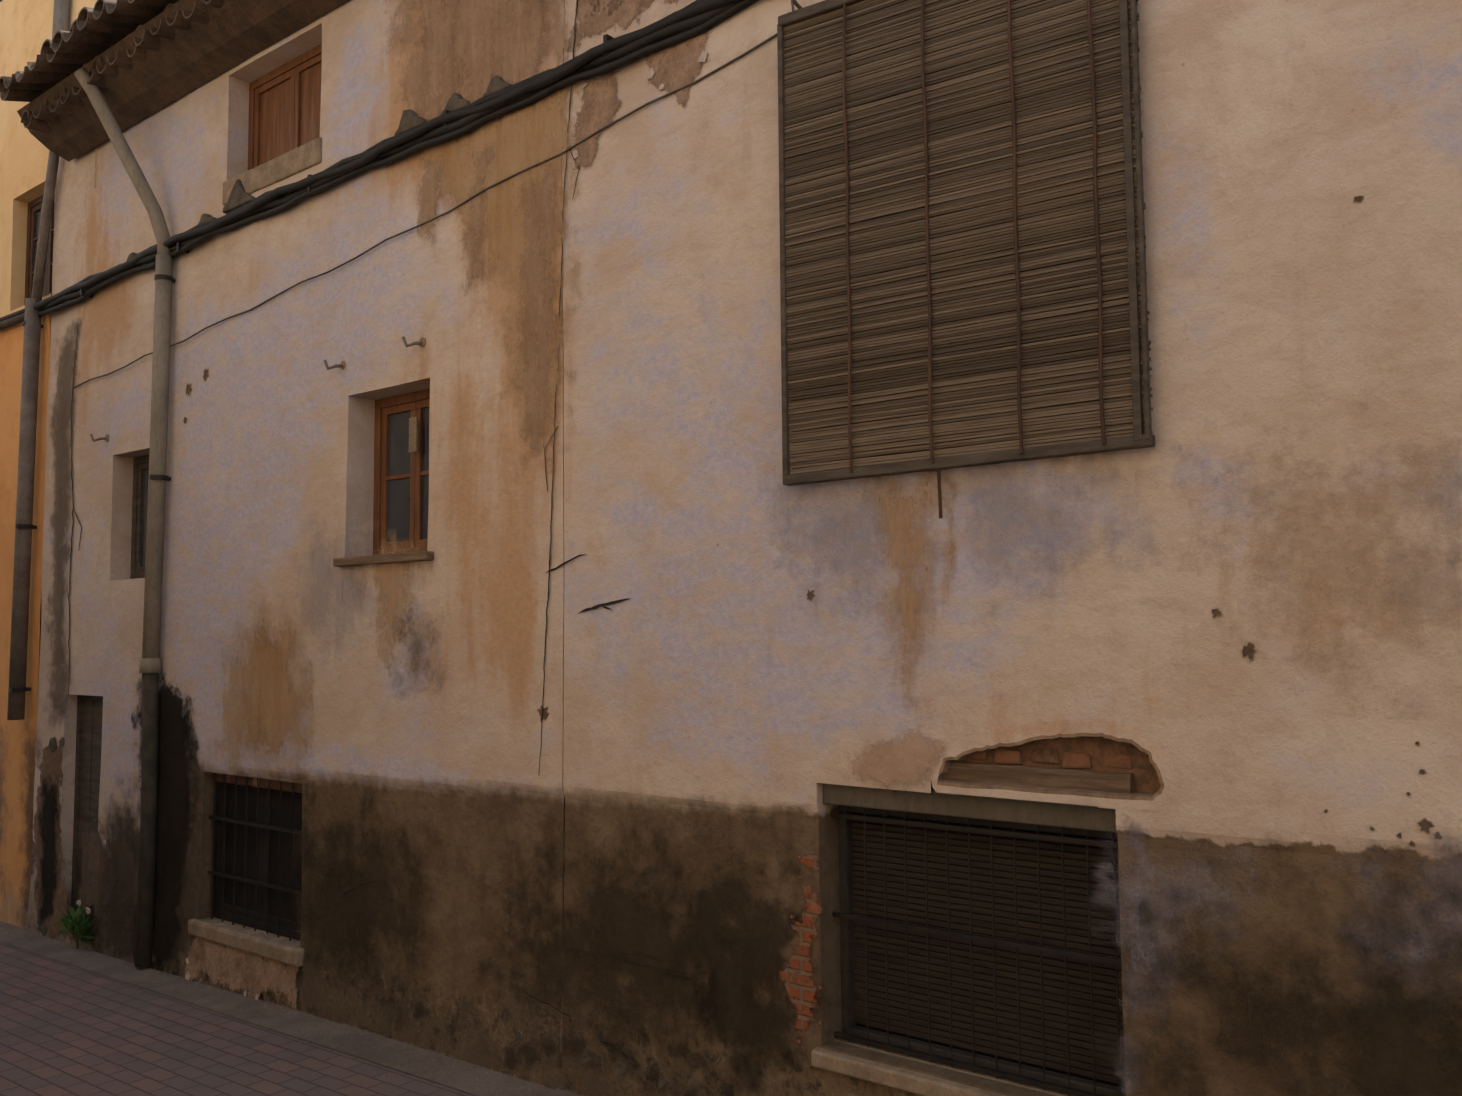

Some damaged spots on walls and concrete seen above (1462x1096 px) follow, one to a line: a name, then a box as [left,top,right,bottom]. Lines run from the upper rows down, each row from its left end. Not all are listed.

water stain [393,0,568,120]
peeling [572,70,622,170]
peeling [566,0,678,53]
peeling [646,32,708,108]
water stain [417,88,576,459]
water stain [21,740,36,911]
water stain [92,676,202,971]
water stain [294,821,423,992]
water stain [511,850,799,1089]
spalling [779,853,823,1045]
spalling [929,718,1179,811]
water stain [1131,888,1462,1096]